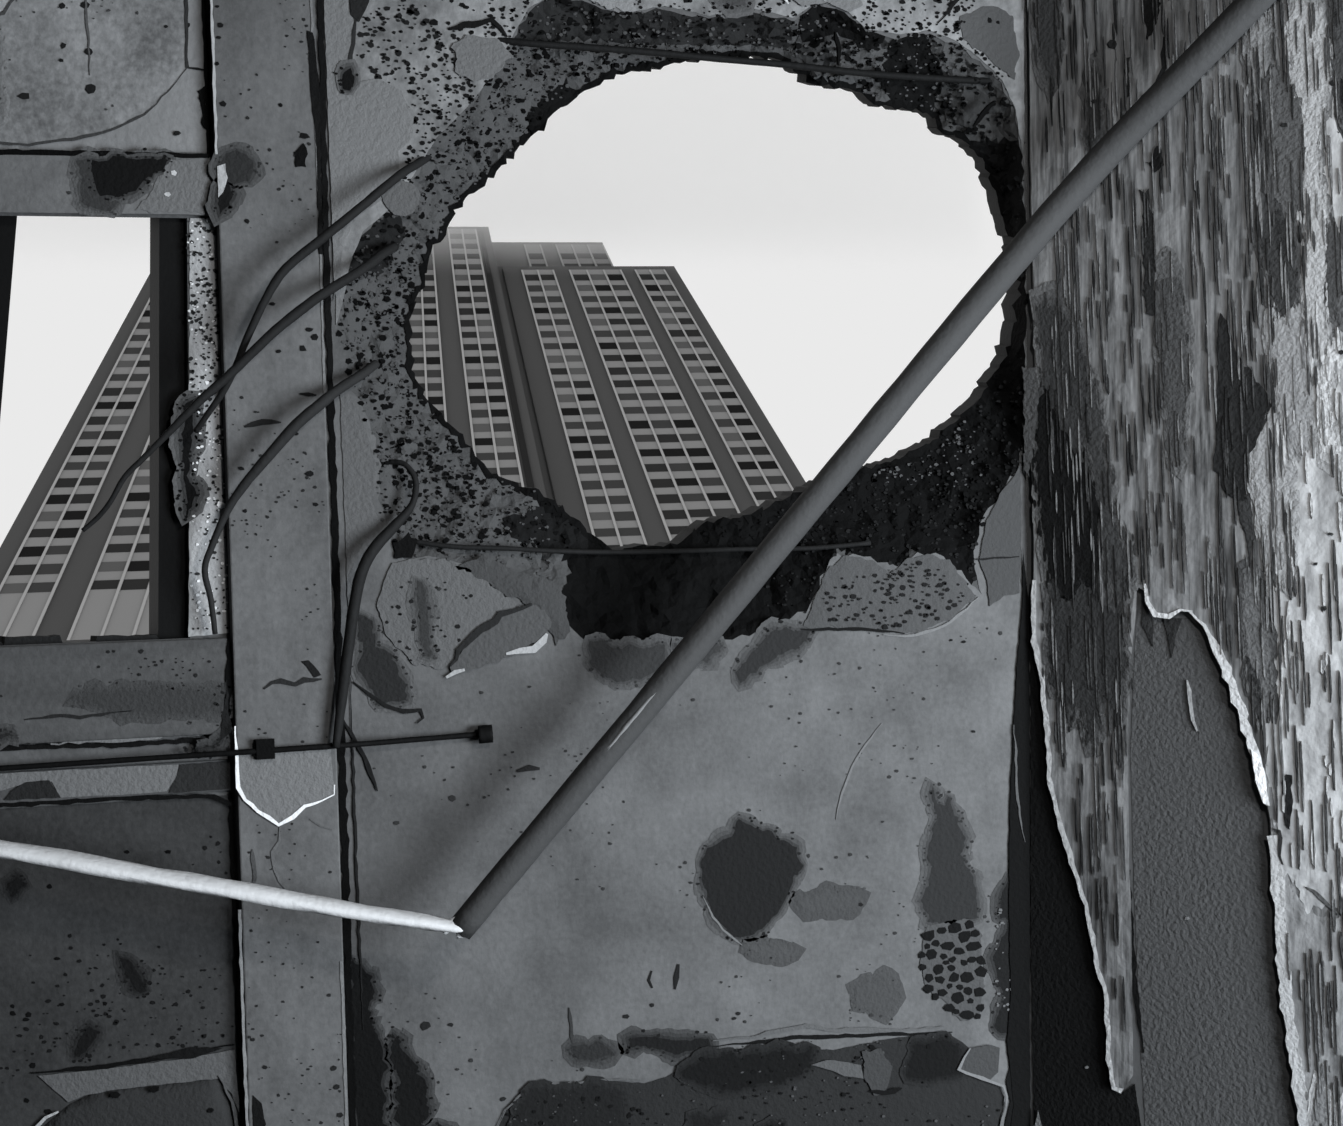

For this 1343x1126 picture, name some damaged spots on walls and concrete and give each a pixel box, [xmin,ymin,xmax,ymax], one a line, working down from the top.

crack [449,17,508,38]
spalling [324,0,1233,674]
crack [0,0,424,1126]
crack [450,603,532,666]
damp [503,495,797,691]
crack [801,626,905,634]
damp [694,0,1343,1126]
crack [516,764,540,772]
crack [647,964,680,990]
damp [344,955,459,1126]
damp [507,1025,823,1126]
crack [715,1032,952,1047]